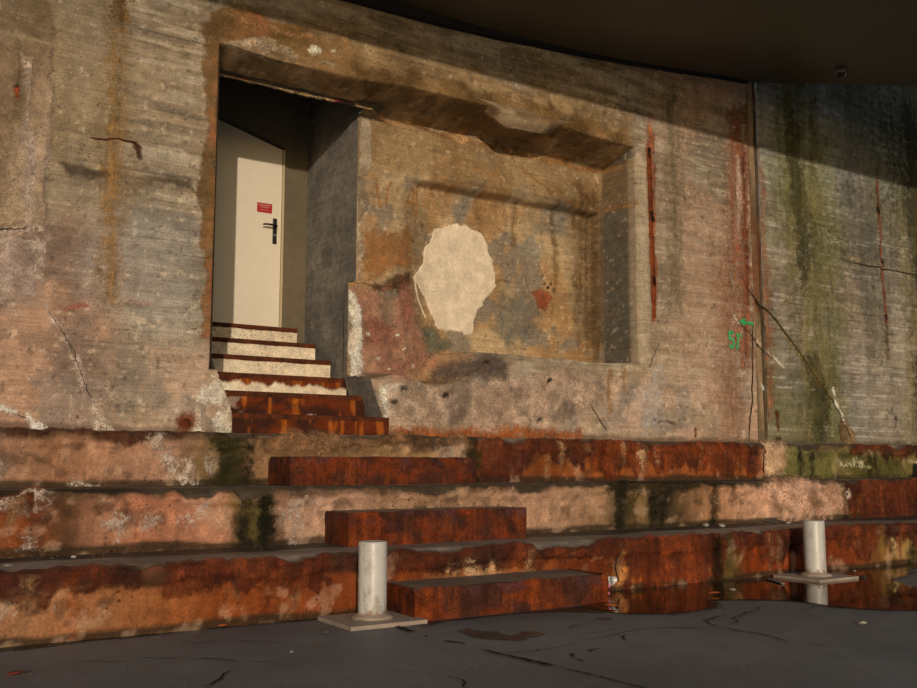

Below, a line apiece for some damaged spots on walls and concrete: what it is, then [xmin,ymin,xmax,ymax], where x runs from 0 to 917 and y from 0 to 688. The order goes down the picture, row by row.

crack [86,136,142,159]
damp [197,7,628,351]
damp [783,95,843,288]
damp [903,104,917,279]
rust [390,104,782,482]
crack [839,252,917,276]
crack [0,404,48,430]
spalling [262,273,607,457]
damp [806,352,831,444]
rust [825,477,917,562]
rust [0,563,143,613]
rust [162,552,332,602]